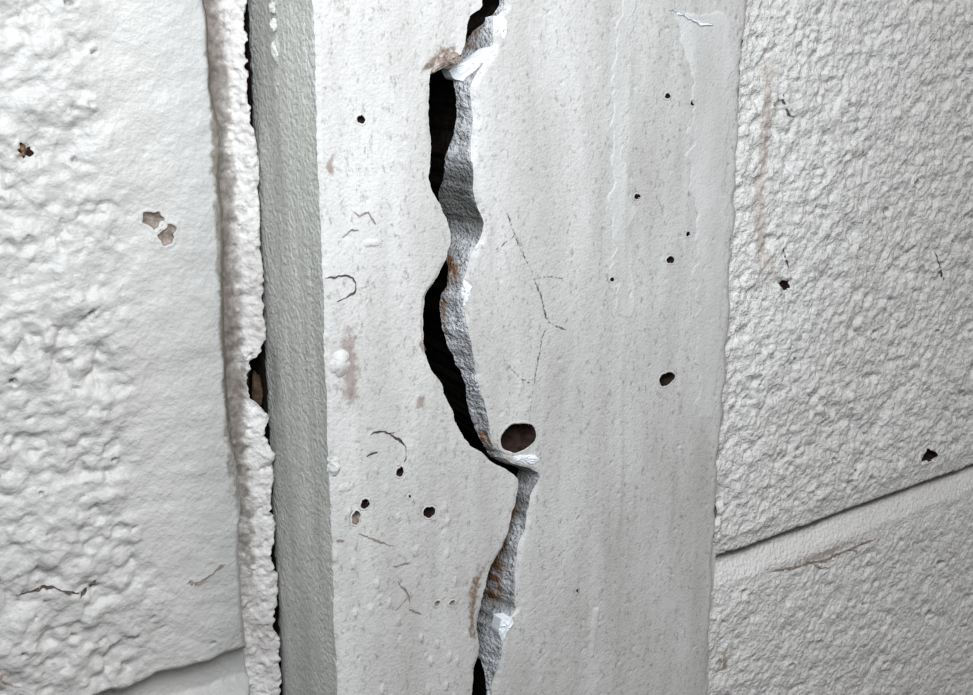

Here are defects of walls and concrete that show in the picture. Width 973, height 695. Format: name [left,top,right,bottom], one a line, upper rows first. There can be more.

spalling [138,208,180,250]
water stain [202,0,253,557]
crack [244,0,254,128]
crack [245,312,283,695]
crack [423,0,565,695]